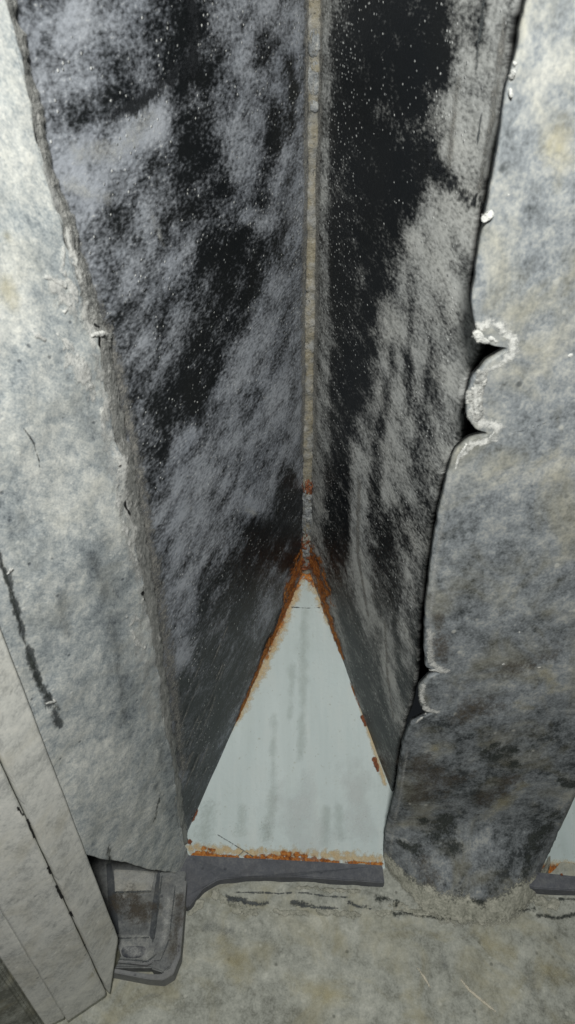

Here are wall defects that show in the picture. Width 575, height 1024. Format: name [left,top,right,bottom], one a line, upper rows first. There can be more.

corrosion [236,534,344,723]
corrosion [350,683,386,785]
corrosion [188,839,383,866]
leakage [397,813,463,886]
leakage [518,810,562,878]